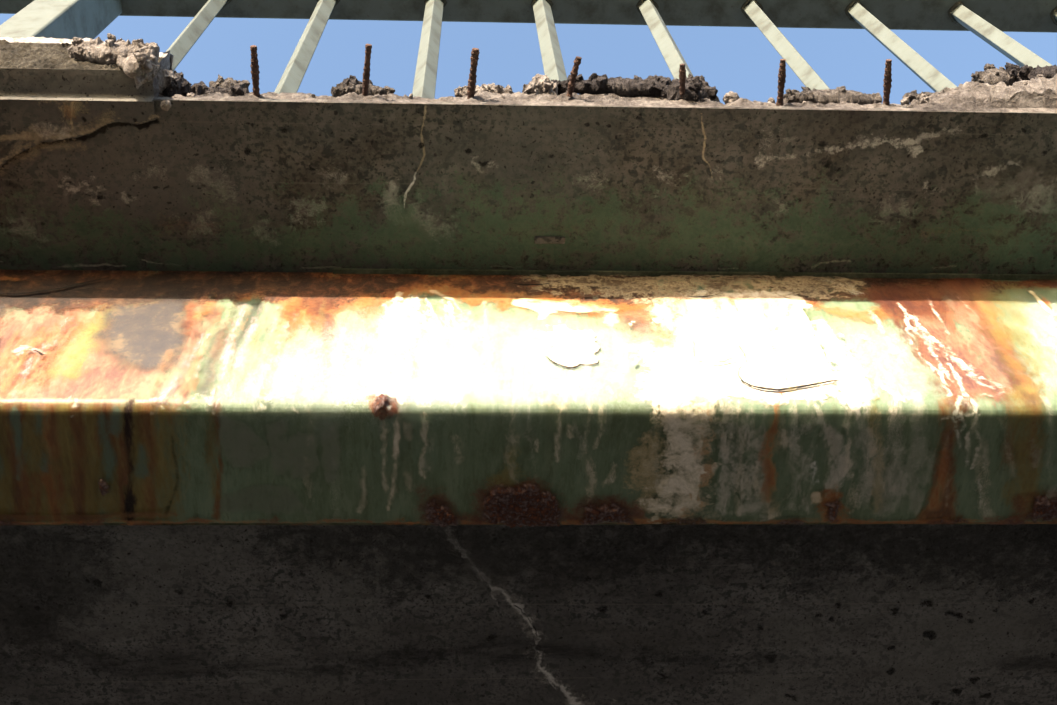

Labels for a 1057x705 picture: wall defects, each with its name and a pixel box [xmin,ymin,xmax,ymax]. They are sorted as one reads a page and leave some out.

crack [0,101,159,176]
crack [400,105,427,218]
spalling [153,44,1057,120]
corrosion [0,270,659,526]
leakage [0,280,1057,686]
peeling [427,286,869,411]
corrosion [621,278,1057,525]
crack [429,525,618,705]